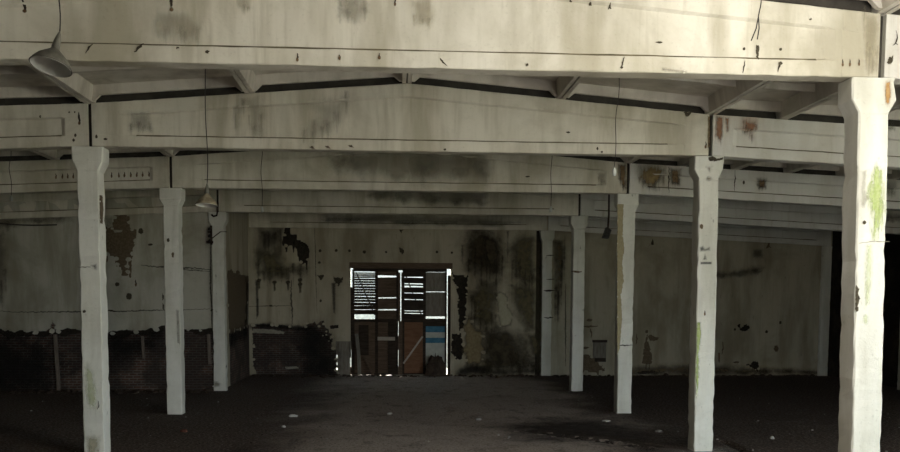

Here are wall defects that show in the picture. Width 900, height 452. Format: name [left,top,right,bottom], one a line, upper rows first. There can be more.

corrosion [716,116,729,140]
peeling [105,215,153,286]
flaking render [0,323,82,391]
flaking render [108,325,167,391]
flaking render [184,269,337,391]
spalling [317,275,344,313]
leakage [466,230,539,371]